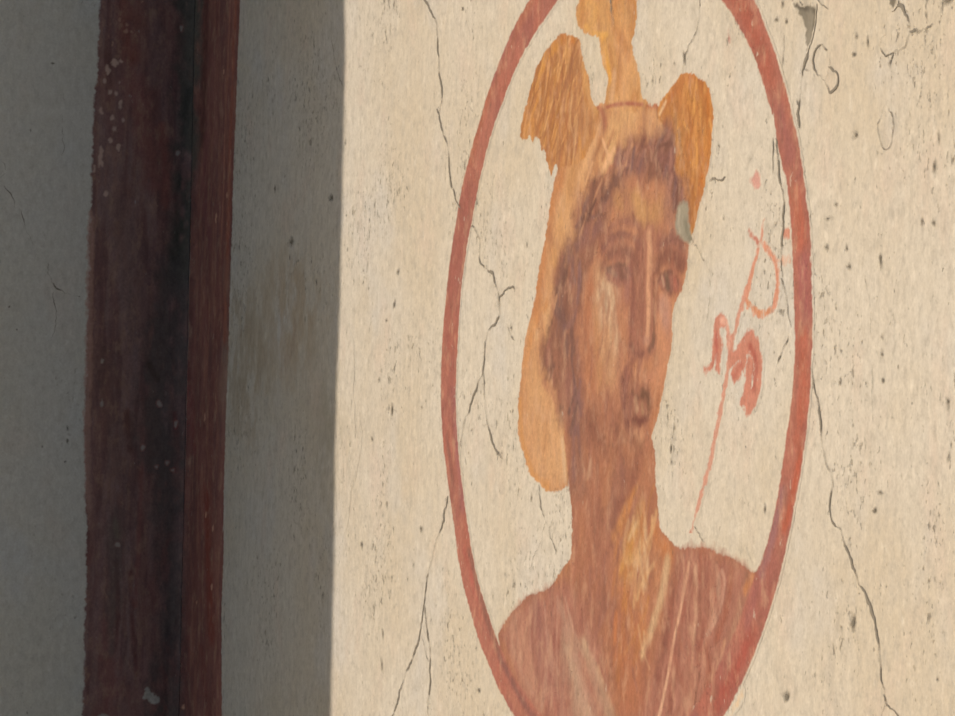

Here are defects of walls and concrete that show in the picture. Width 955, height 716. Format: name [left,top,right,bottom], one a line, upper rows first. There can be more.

spalling [775,0,817,54]
peeling [91,57,126,175]
crack [424,0,473,227]
crack [468,259,515,455]
crack [813,379,822,436]
crack [392,574,431,716]
crack [827,491,898,716]